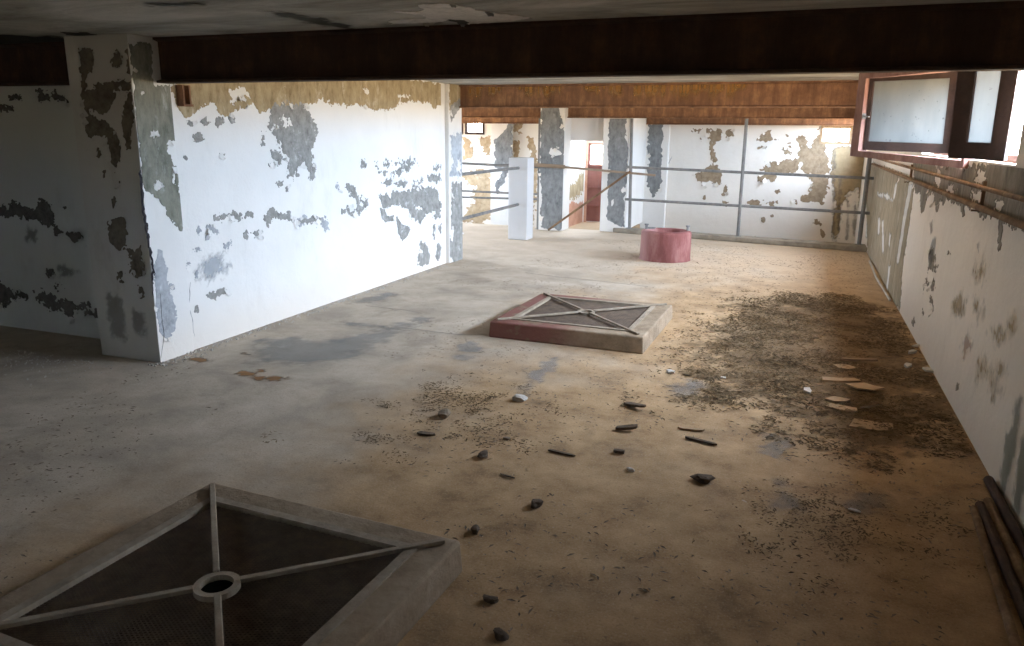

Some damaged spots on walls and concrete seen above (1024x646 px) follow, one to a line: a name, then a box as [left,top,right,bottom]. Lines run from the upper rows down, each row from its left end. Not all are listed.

peeling [0,93,22,116]
peeling [0,198,83,243]
peeling [35,32,584,342]
peeling [604,119,628,228]
peeling [646,124,664,198]
peeling [691,128,735,207]
peeling [747,127,831,223]
peeling [865,161,1024,309]
peeling [911,247,951,327]
corrosion [235,369,288,381]